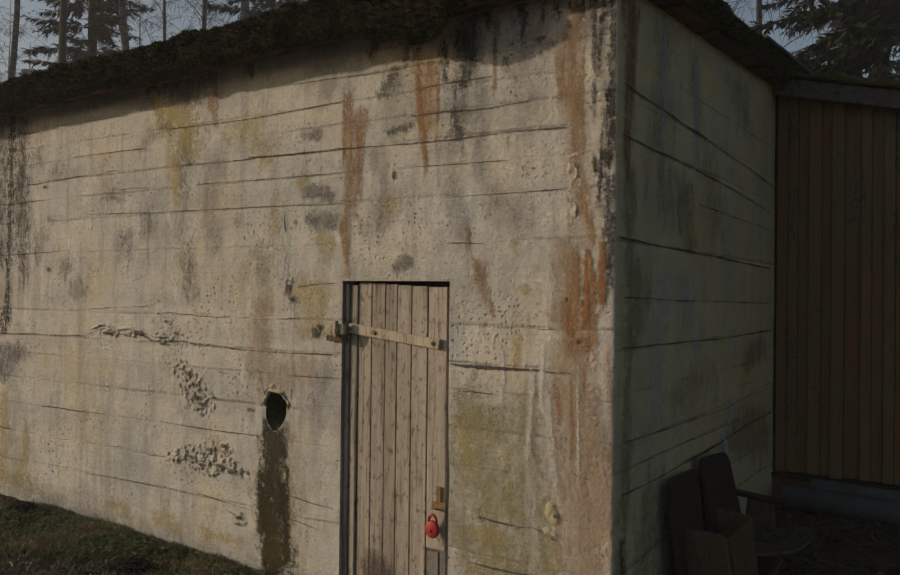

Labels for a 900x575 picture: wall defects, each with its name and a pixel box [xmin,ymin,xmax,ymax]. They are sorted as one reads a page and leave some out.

rust [340,95,367,277]
rust [412,57,440,171]
water stain [536,0,616,290]
rust [555,6,606,357]
water stain [0,116,57,504]
crack [0,323,334,391]
spalling [172,358,216,419]
spalling [164,436,250,480]
water stain [256,417,297,575]